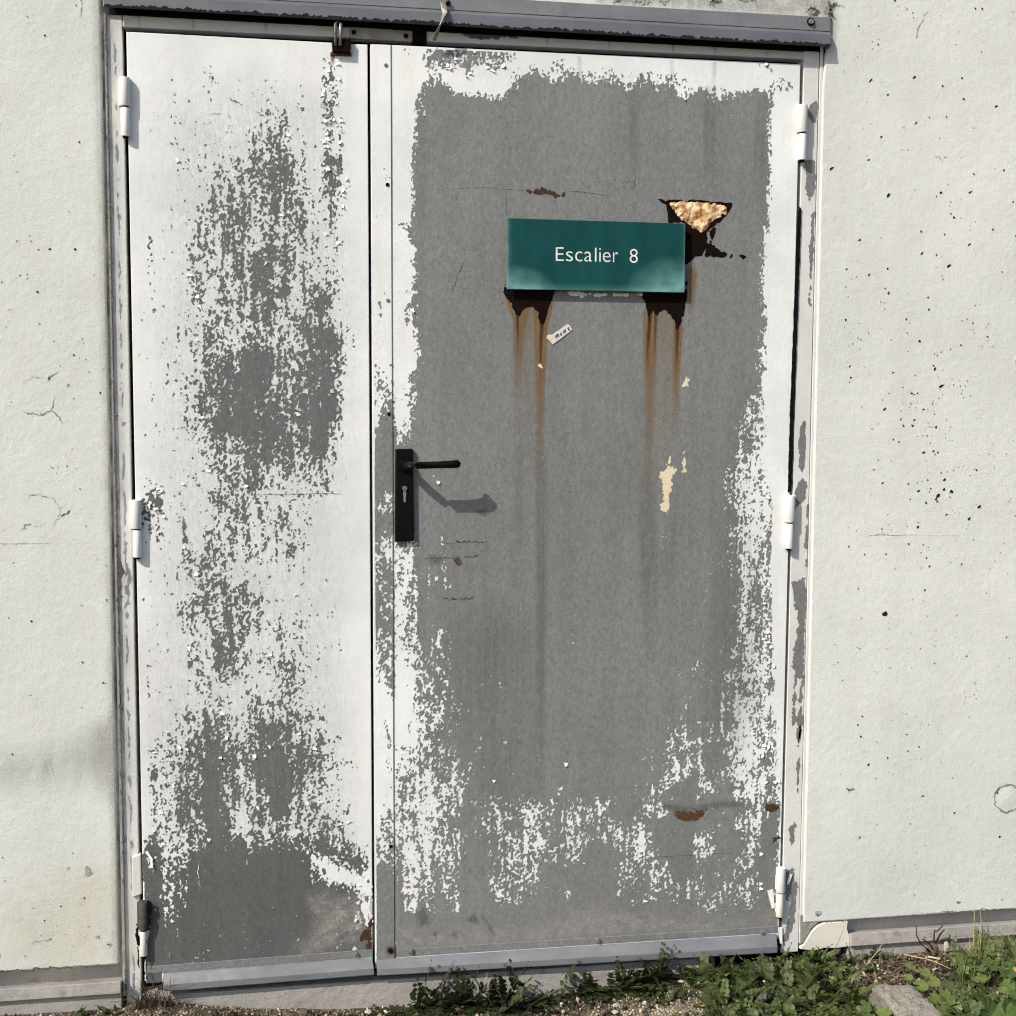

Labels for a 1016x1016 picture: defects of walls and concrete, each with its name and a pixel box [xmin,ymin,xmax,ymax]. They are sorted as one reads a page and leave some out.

corrosion [503,284,560,411]
corrosion [642,199,732,383]
spalling [97,445,125,657]
peeling [141,47,1015,983]